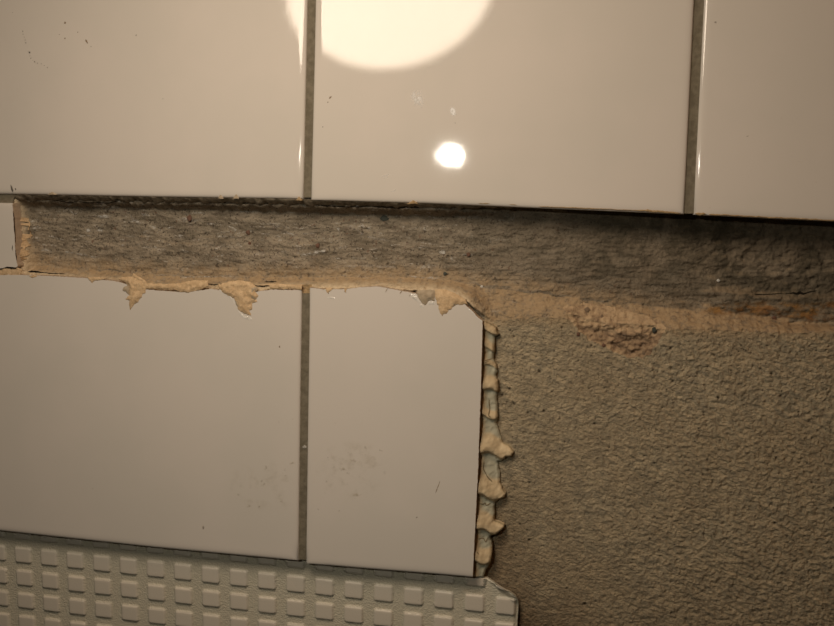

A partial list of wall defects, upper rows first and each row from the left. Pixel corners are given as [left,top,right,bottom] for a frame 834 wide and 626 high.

spalling [563,302,666,359]